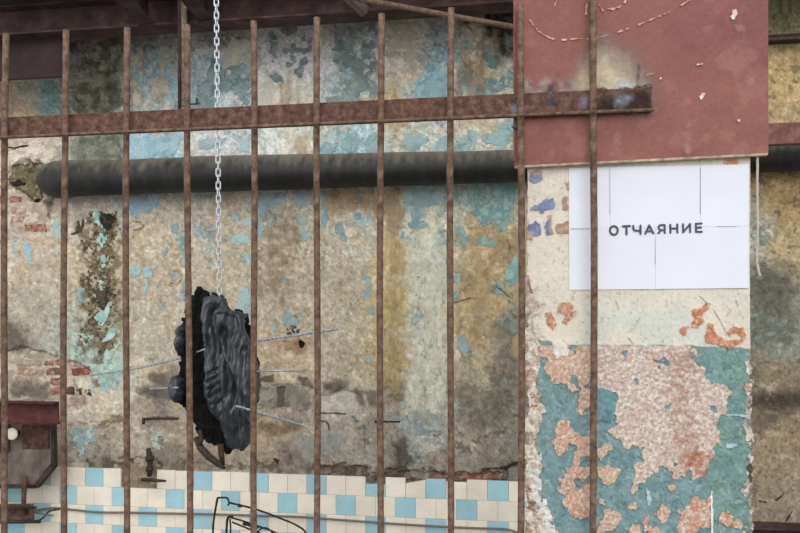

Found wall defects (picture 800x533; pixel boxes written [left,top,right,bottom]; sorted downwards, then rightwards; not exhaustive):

peeling [196,26,313,108]
peeling [325,19,447,102]
peeling [129,135,180,159]
flaking render [0,142,61,262]
peeling [526,182,569,240]
peeling [0,193,162,407]
peeling [236,285,251,315]
water stain [384,231,447,416]
peeling [680,303,793,350]
water stain [324,379,376,405]
flaking render [257,247,754,533]
water stain [393,438,412,471]